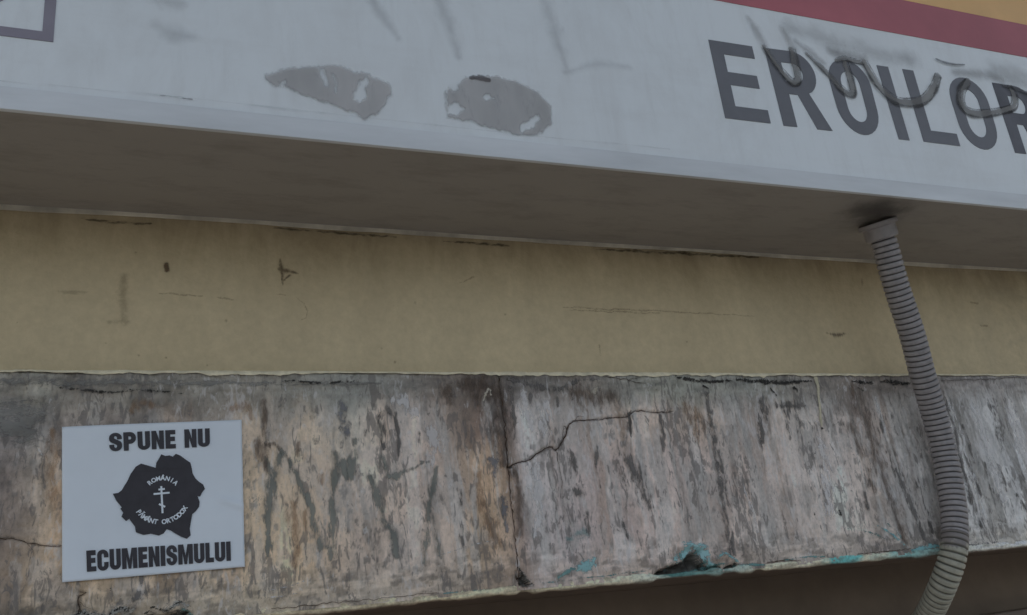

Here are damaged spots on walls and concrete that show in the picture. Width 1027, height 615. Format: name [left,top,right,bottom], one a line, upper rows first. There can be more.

damp [256,400,280,469]
damp [338,401,351,436]
damp [365,393,419,456]
damp [443,376,545,538]
crack [507,410,668,480]
damp [620,455,654,509]
damp [705,389,735,555]
damp [758,395,806,447]
damp [848,386,934,541]
damp [943,397,1027,527]
damp [132,576,149,601]
spalling [654,541,764,575]